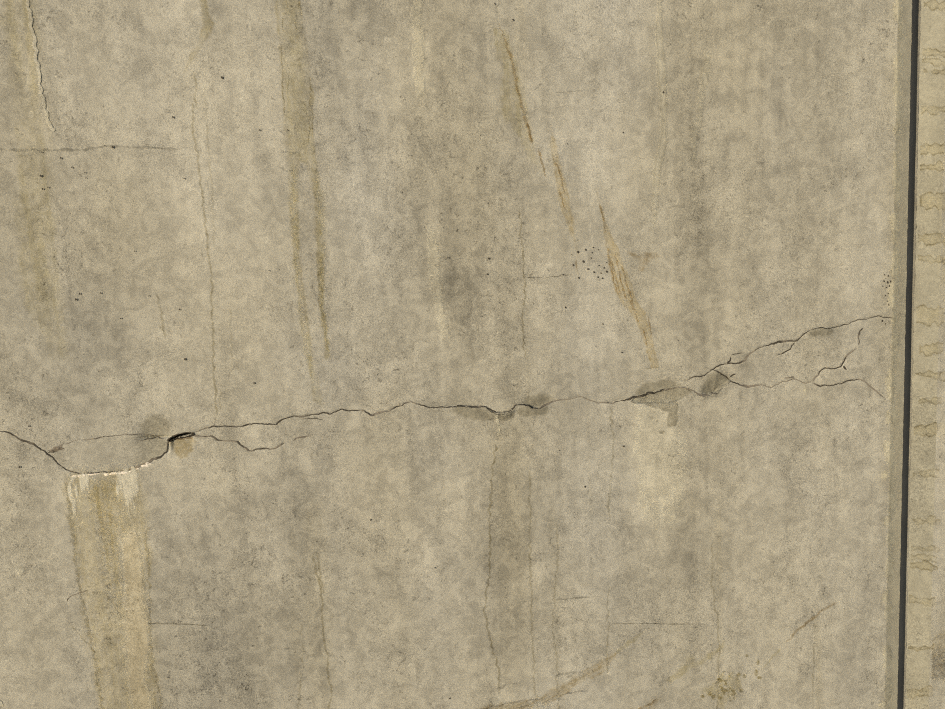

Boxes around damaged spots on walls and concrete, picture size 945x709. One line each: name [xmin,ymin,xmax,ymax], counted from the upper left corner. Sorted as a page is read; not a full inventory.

crack [0,313,901,474]
efflorescence [68,462,151,512]
water stain [123,530,152,709]